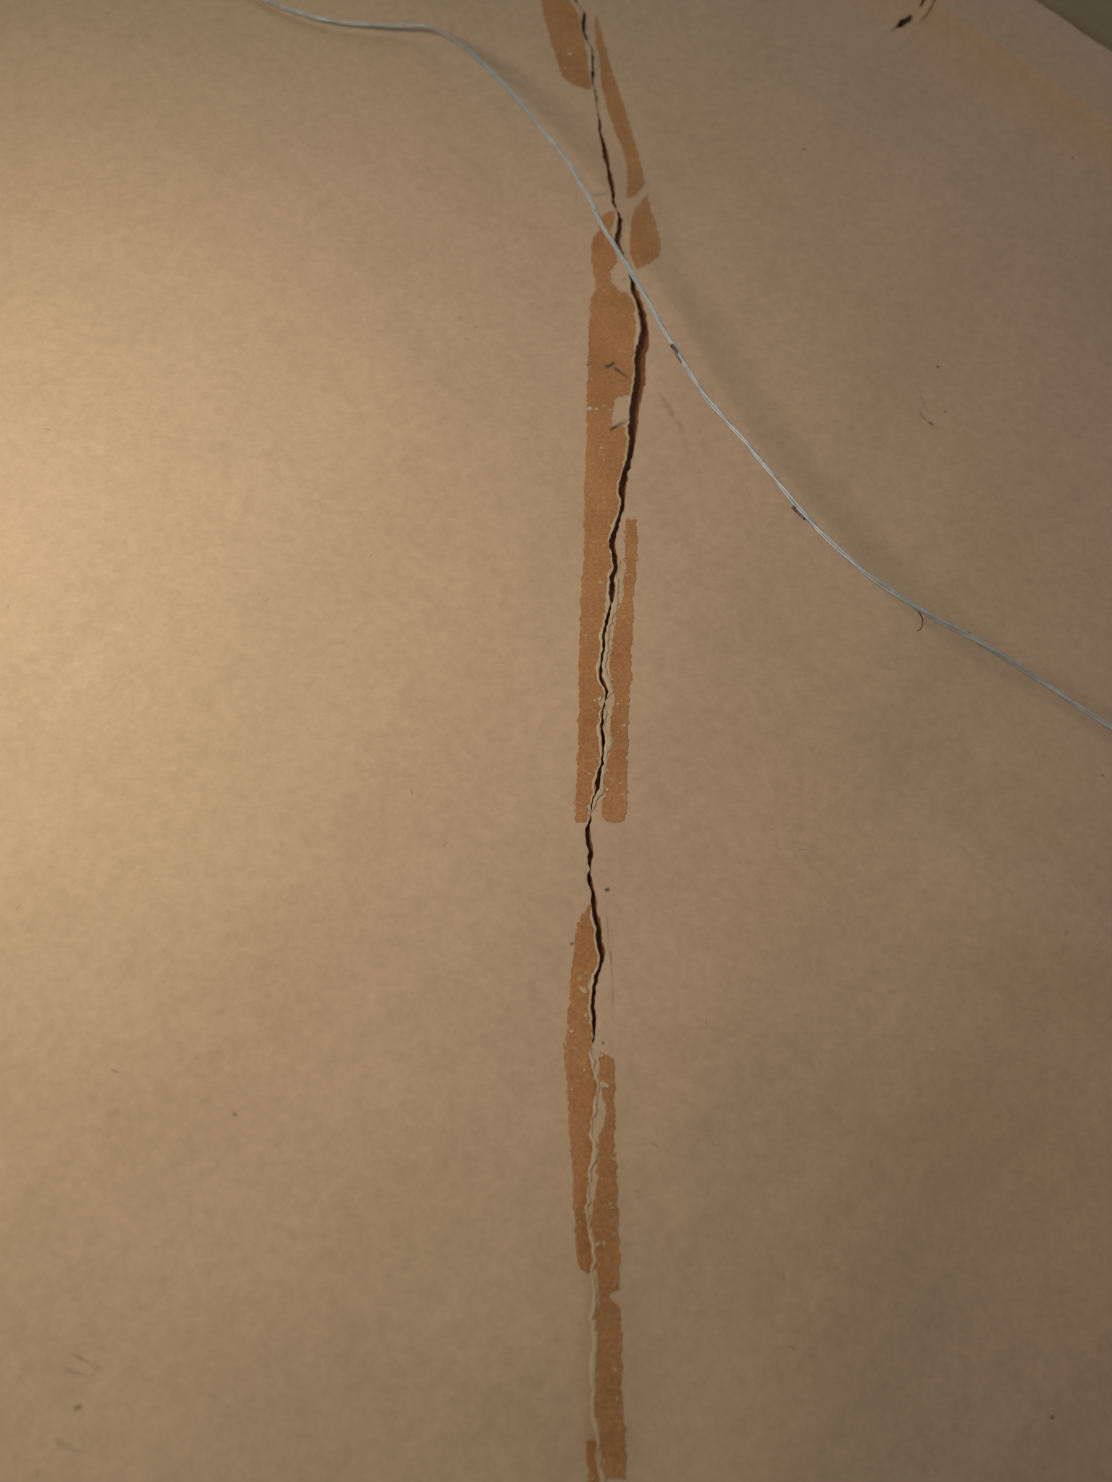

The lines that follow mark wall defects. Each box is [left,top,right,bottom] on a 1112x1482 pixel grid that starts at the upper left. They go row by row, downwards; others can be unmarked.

peeling [541,0,661,823]
crack [572,0,649,1482]
peeling [563,905,627,1482]